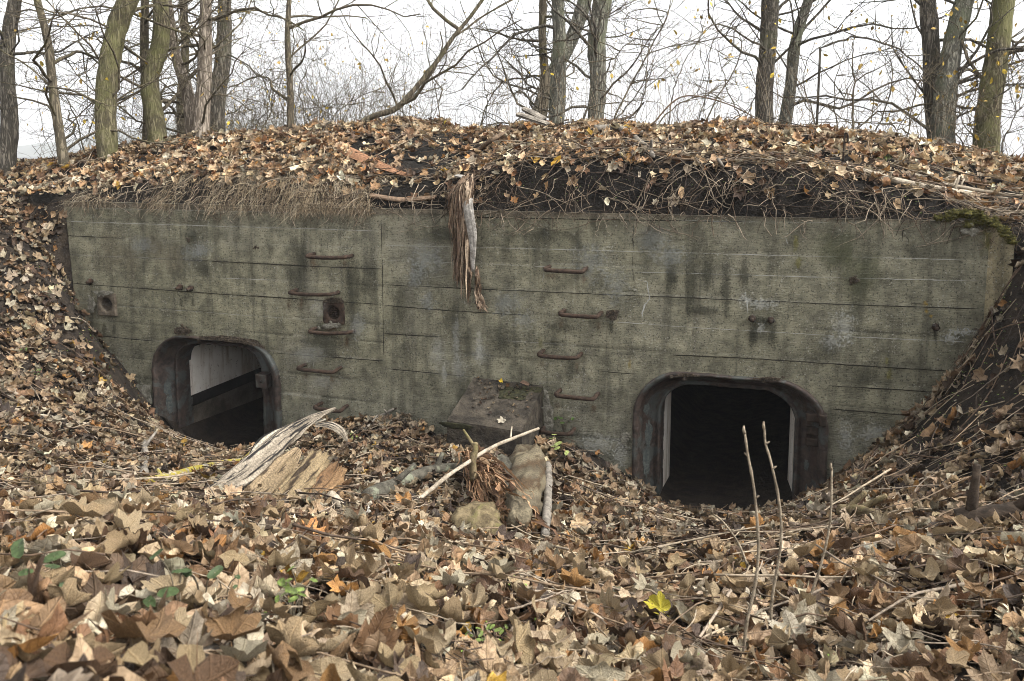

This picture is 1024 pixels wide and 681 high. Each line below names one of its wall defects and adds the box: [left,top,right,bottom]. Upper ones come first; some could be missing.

leakage [608,252,832,349]